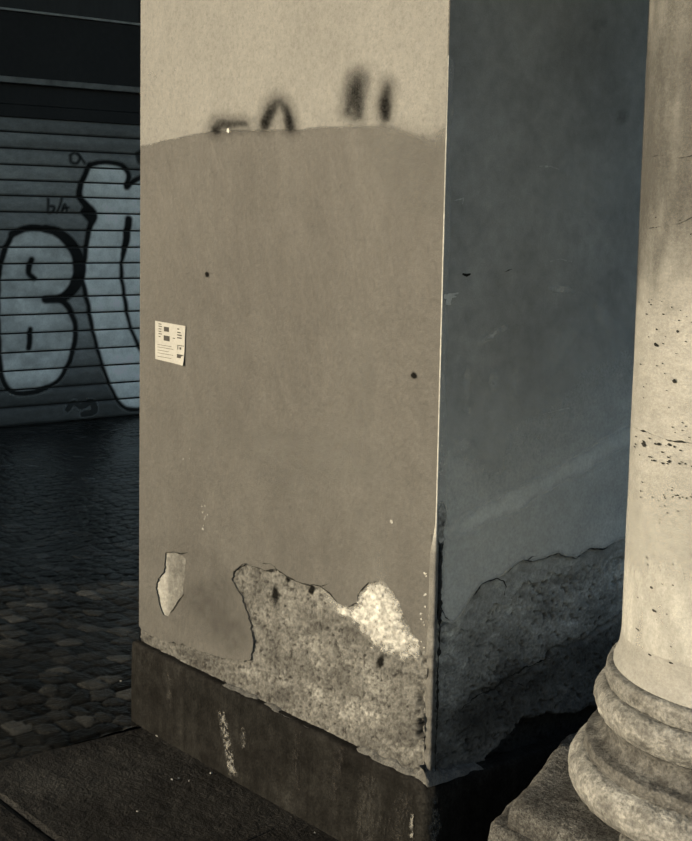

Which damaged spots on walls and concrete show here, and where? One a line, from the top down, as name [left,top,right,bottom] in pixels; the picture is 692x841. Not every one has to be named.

spalling [140,539,625,841]